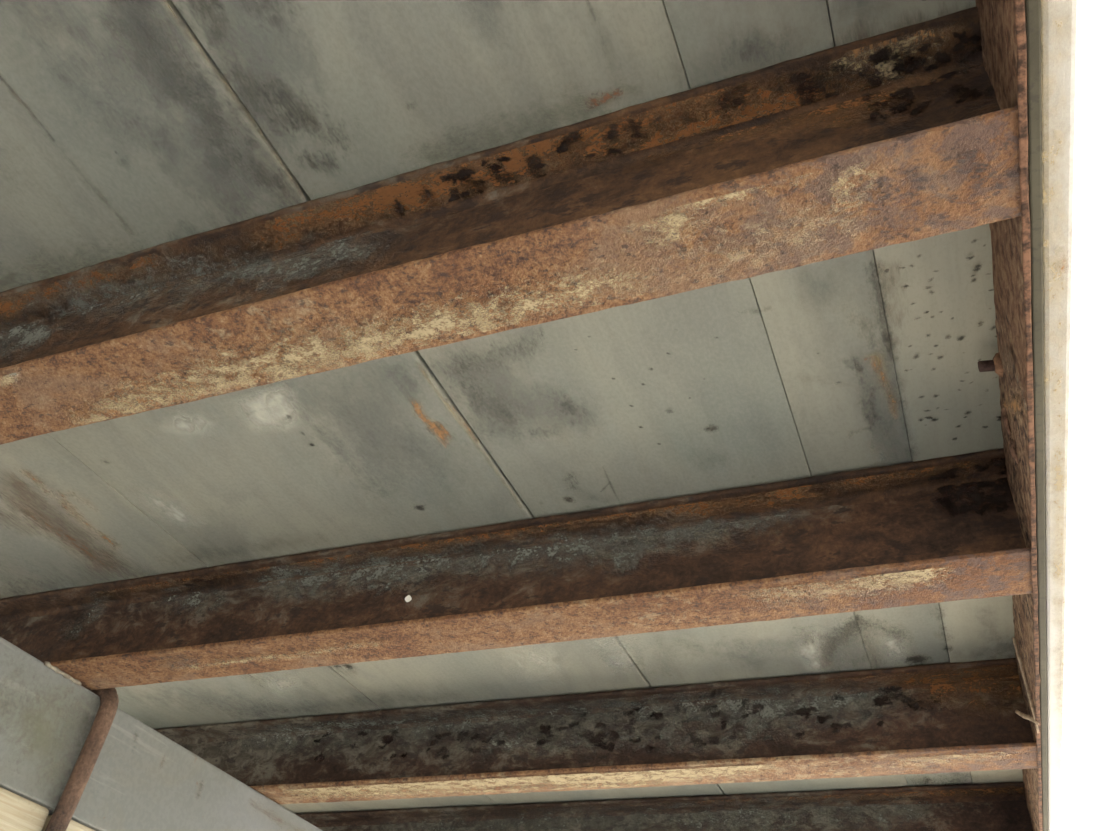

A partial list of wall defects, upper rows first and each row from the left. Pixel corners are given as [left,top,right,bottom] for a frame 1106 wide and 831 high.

corrosion [255,30,995,250]
corrosion [864,138,1020,240]
corrosion [3,478,117,570]
corrosion [289,485,819,568]
corrosion [835,458,1013,517]
corrosion [537,713,661,752]
corrosion [674,704,738,748]
corrosion [778,686,941,740]
corrosion [1012,637,1039,733]